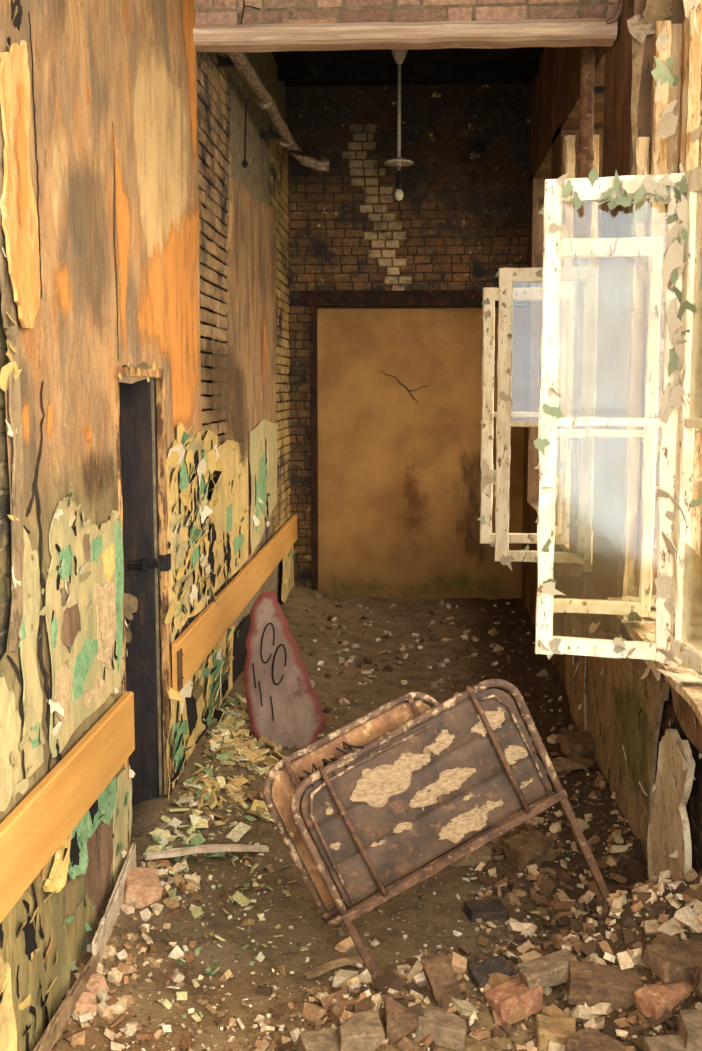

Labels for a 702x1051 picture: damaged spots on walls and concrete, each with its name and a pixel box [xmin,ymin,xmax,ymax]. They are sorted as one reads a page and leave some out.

crack [380,371,428,405]